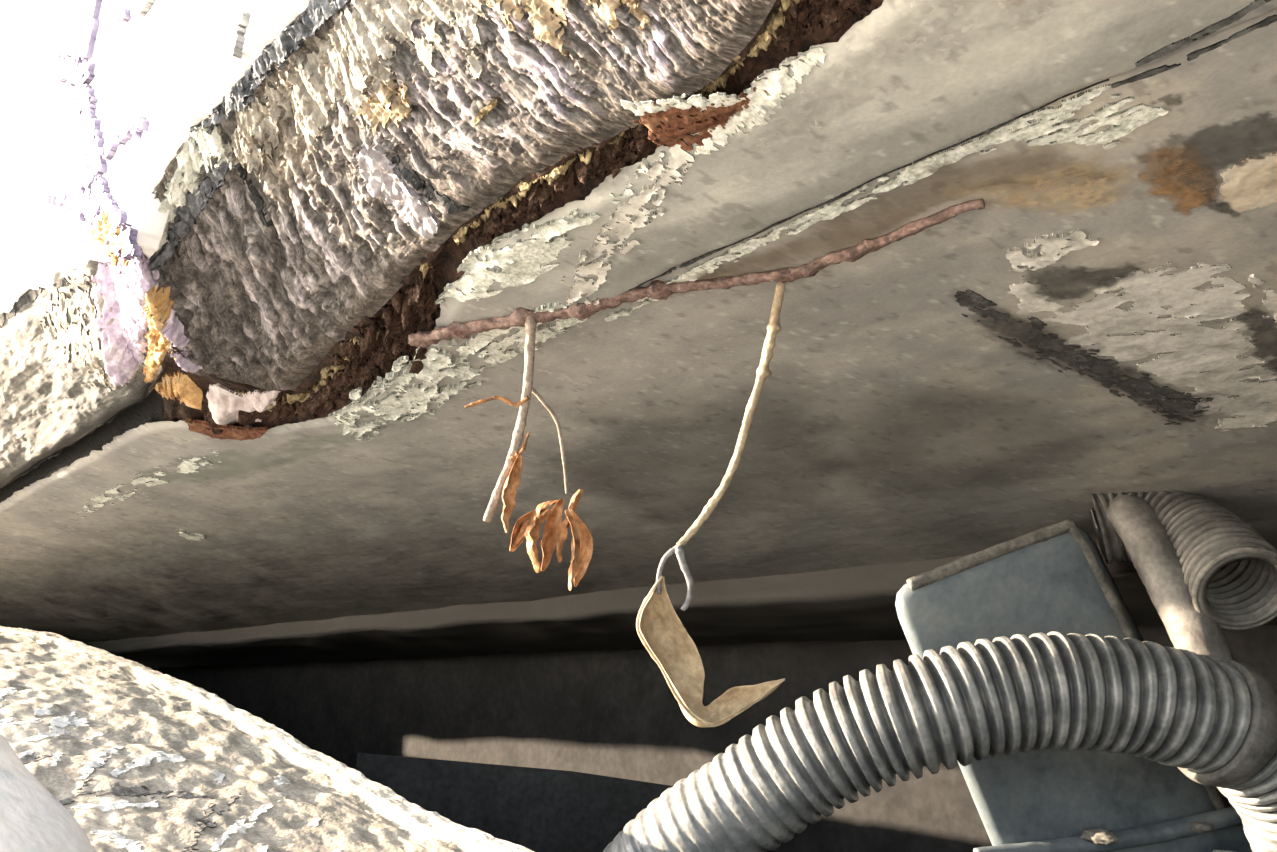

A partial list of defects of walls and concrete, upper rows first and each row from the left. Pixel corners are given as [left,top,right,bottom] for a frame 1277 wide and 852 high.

peeling [585,0,652,38]
peeling [39,0,571,392]
peeling [328,126,695,441]
rust [152,0,884,441]
damp [695,268,737,281]
peeling [664,84,1169,284]
damp [1030,266,1140,299]
damp [967,299,1207,421]
peeling [954,228,1277,432]
rust [1139,148,1216,214]
crack [17,753,54,764]
crack [59,748,241,852]